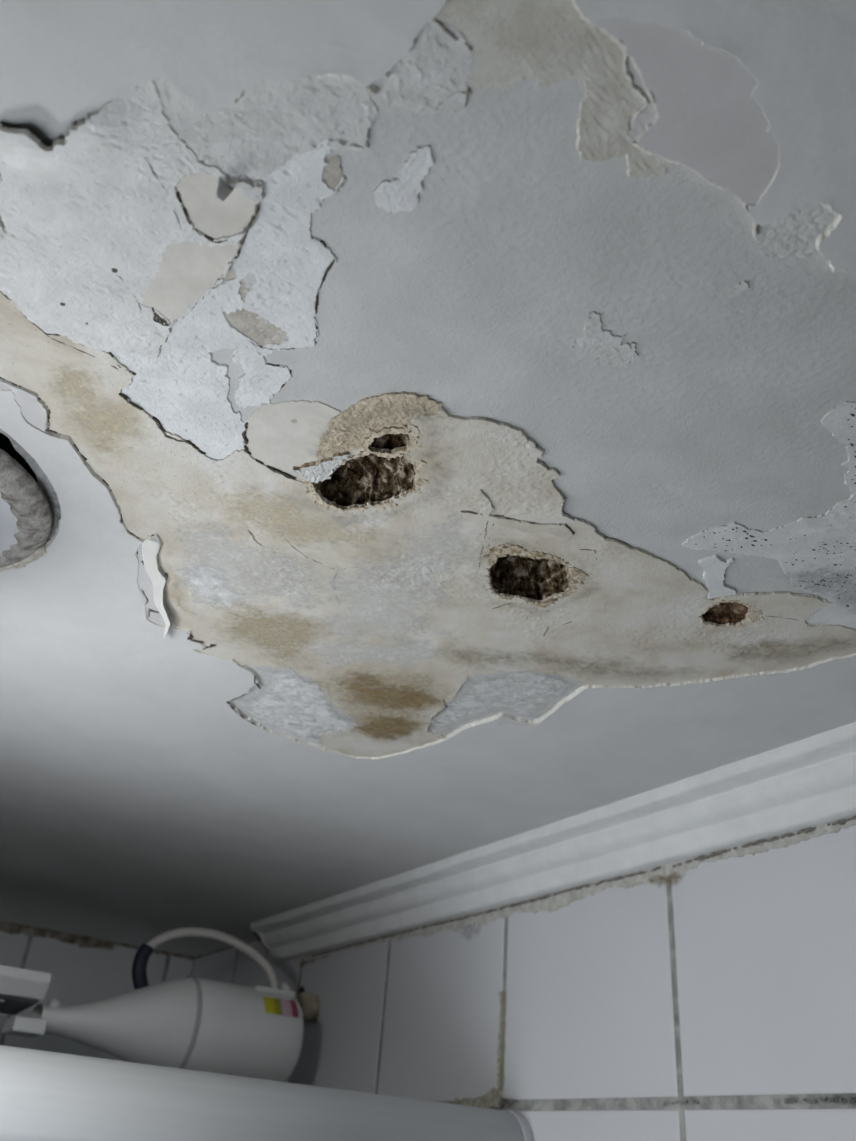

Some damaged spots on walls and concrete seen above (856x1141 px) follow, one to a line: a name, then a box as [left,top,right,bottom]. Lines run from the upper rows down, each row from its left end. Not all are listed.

peeling [0,0,856,757]
damp [681,401,856,629]
damp [181,525,462,742]
damp [432,659,605,735]